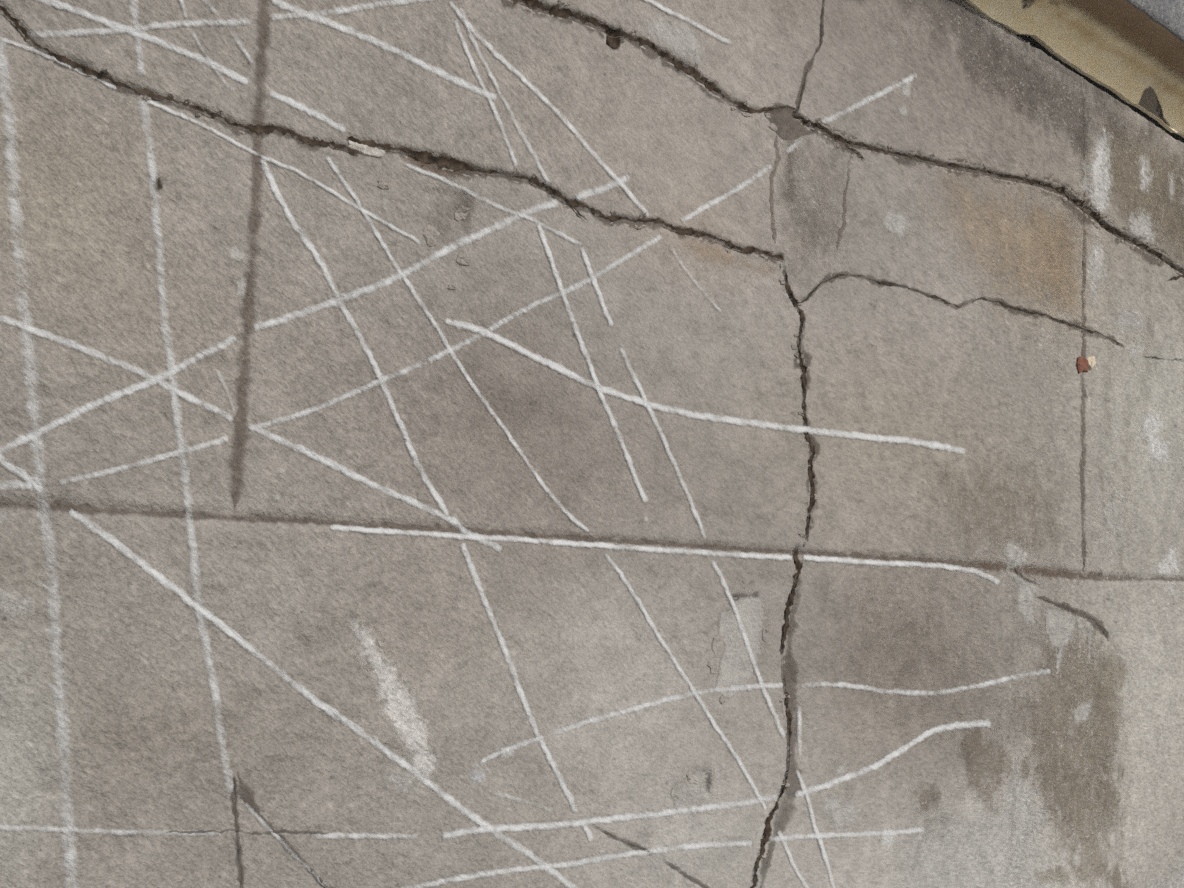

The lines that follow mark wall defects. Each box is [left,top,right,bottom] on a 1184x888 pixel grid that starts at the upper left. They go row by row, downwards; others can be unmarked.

crack [0,0,1184,427]
crack [166,773,334,888]
crack [593,824,710,888]
crack [751,432,820,888]
water stain [914,634,1123,888]
crack [1014,567,1110,642]